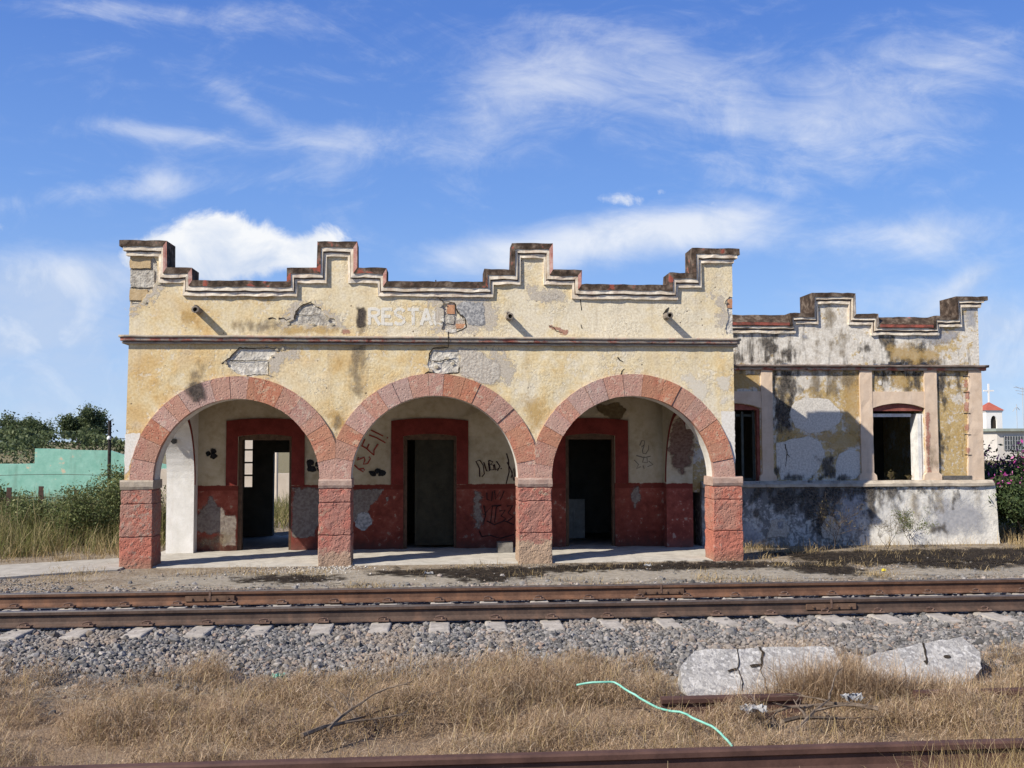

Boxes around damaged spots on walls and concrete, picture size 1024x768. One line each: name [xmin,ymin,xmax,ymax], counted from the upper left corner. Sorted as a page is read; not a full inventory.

flaking render [129,256,161,307]
flaking render [268,302,350,334]
flaking render [438,302,467,333]
leakage [185,372,204,401]
flaking render [221,347,284,377]
flaking render [425,348,500,385]
flaking render [667,418,695,475]
leakage [733,334,961,536]
flaking render [197,496,236,546]
flaking render [292,487,320,538]
flaking render [352,489,389,531]
flaking render [472,491,483,529]